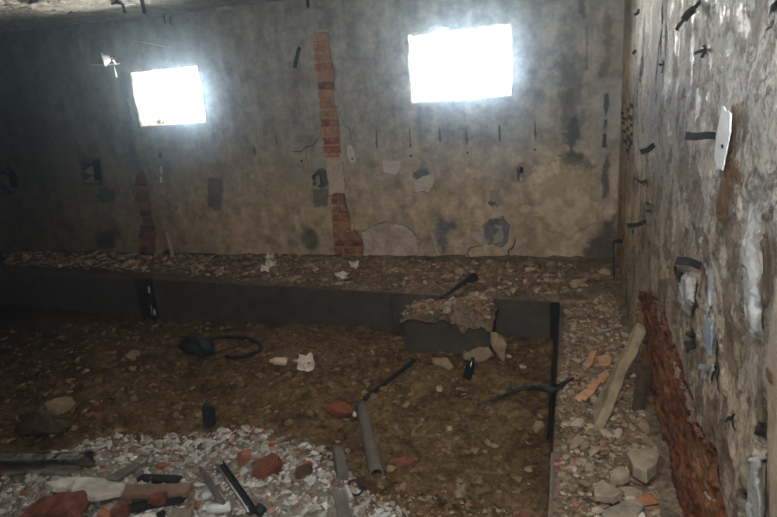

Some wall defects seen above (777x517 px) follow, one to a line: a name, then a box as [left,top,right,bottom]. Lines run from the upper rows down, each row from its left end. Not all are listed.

spalling [313,29,356,164]
spalling [312,168,329,188]
spalling [472,216,510,247]
spalling [635,291,726,517]
spalling [753,421,767,437]
peeling [737,457,767,517]